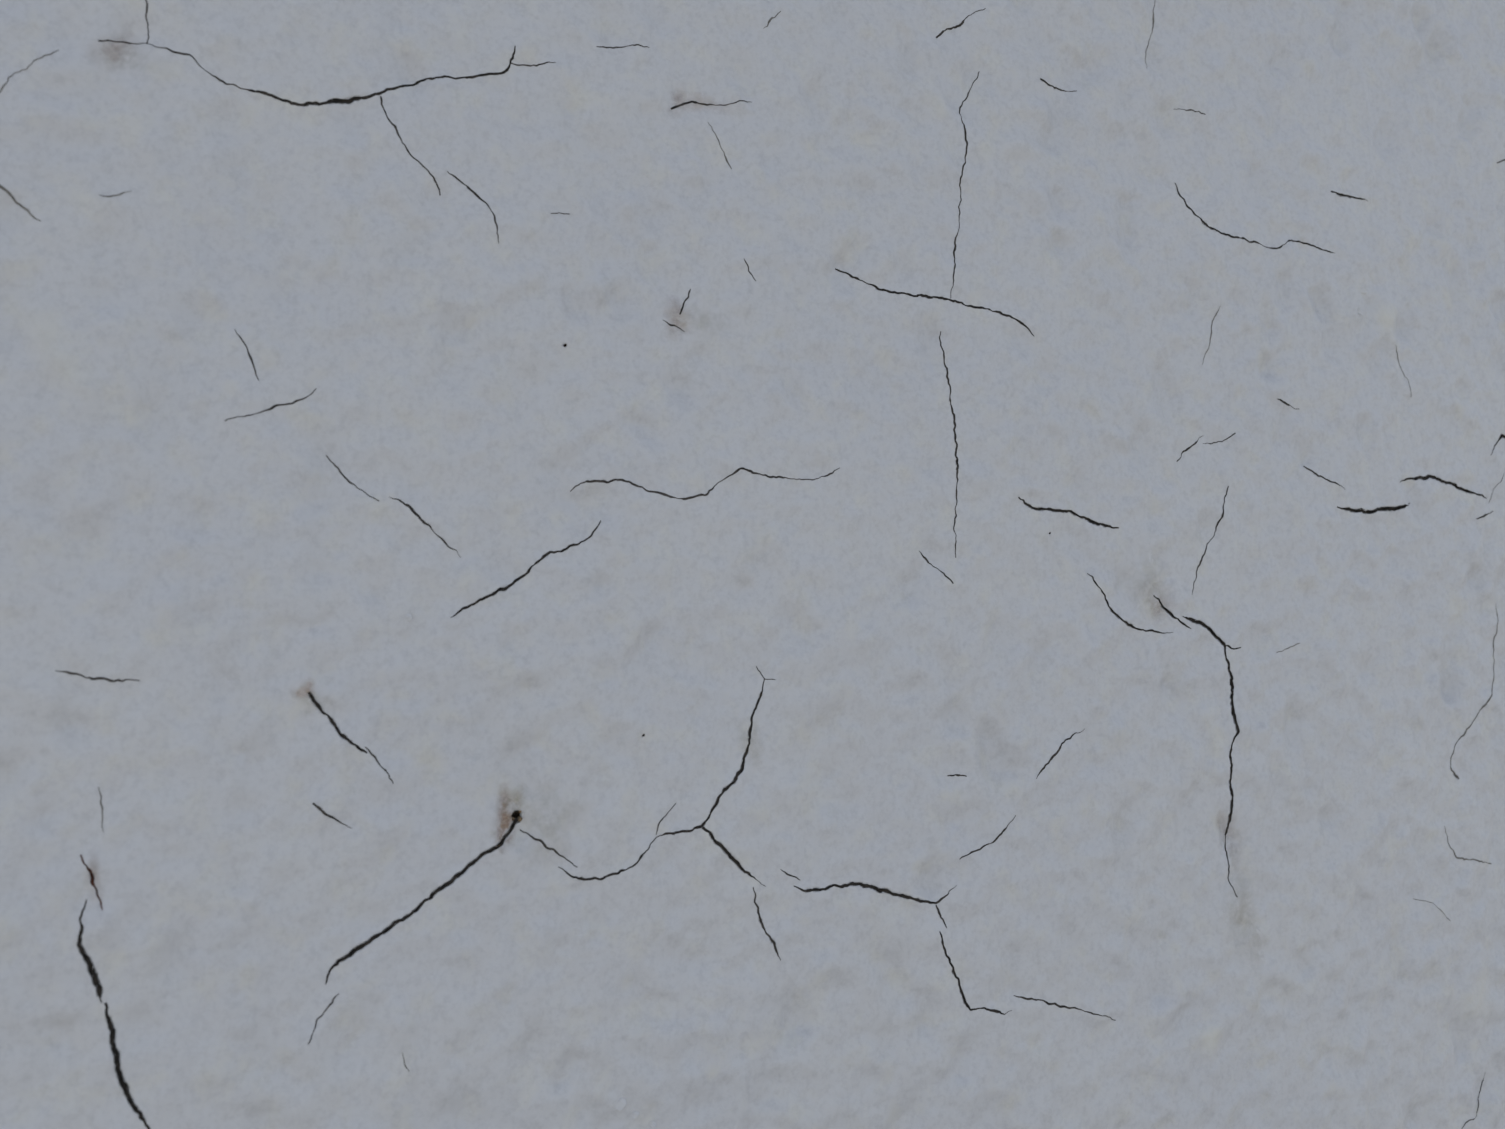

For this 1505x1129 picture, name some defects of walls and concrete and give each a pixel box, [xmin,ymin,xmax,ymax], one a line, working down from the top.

crack [0,50,59,92]
crack [98,0,556,243]
crack [0,185,41,221]
crack [1175,183,1334,253]
crack [835,72,1035,584]
crack [570,467,840,500]
crack [1018,497,1119,529]
crack [1303,434,1505,519]
crack [450,520,601,618]
crack [1087,486,1300,897]
crack [308,666,1116,1044]
crack [77,787,150,1129]